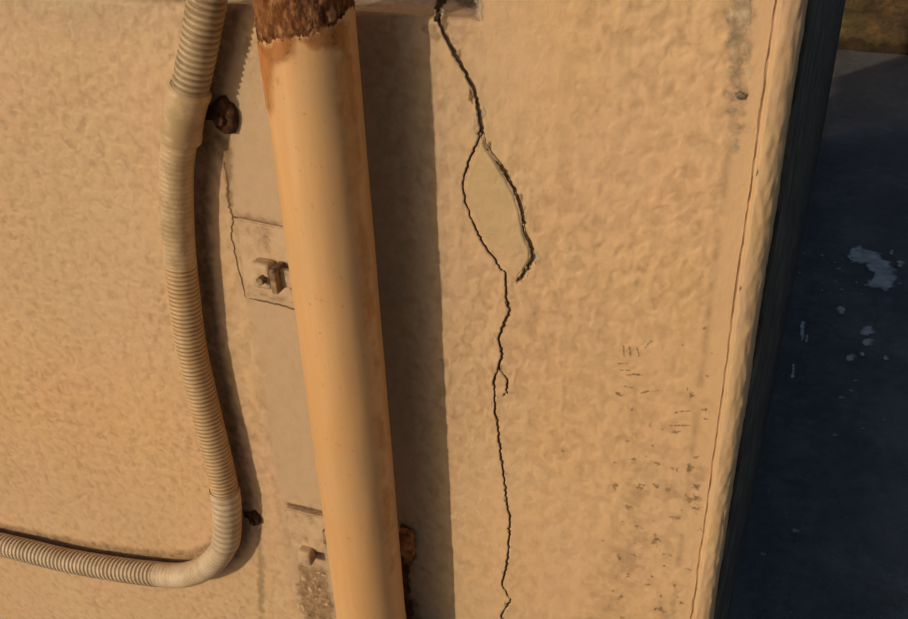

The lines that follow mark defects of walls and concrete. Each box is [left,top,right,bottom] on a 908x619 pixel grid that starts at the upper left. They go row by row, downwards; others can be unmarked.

corrosion [252,0,353,111]
crack [433,0,541,619]
corrosion [401,553,417,619]